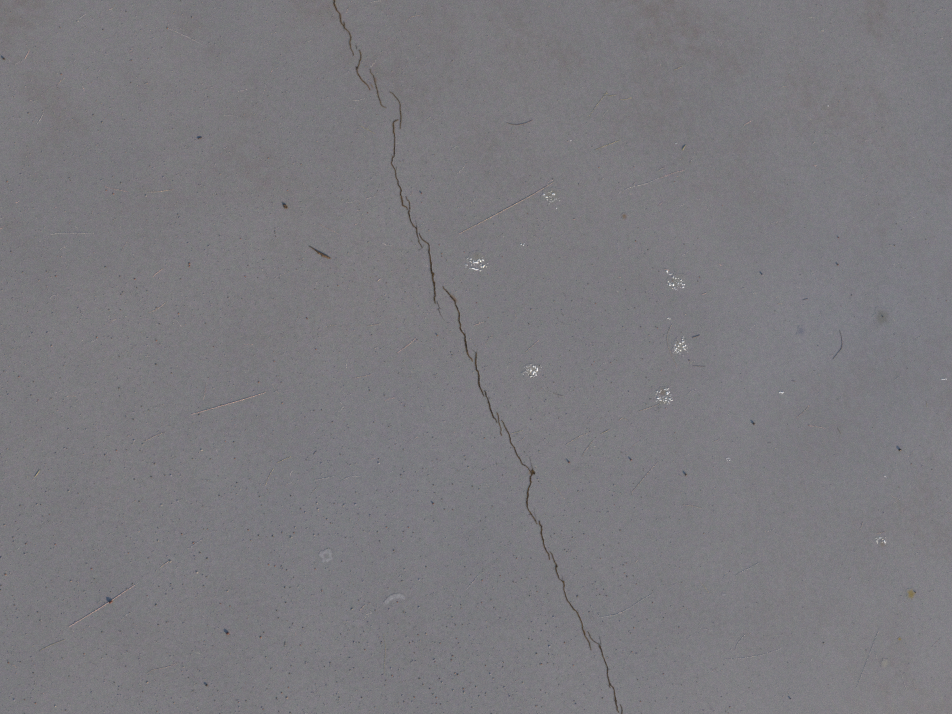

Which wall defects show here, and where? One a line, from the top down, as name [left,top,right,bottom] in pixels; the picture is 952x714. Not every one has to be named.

crack [333,0,642,714]